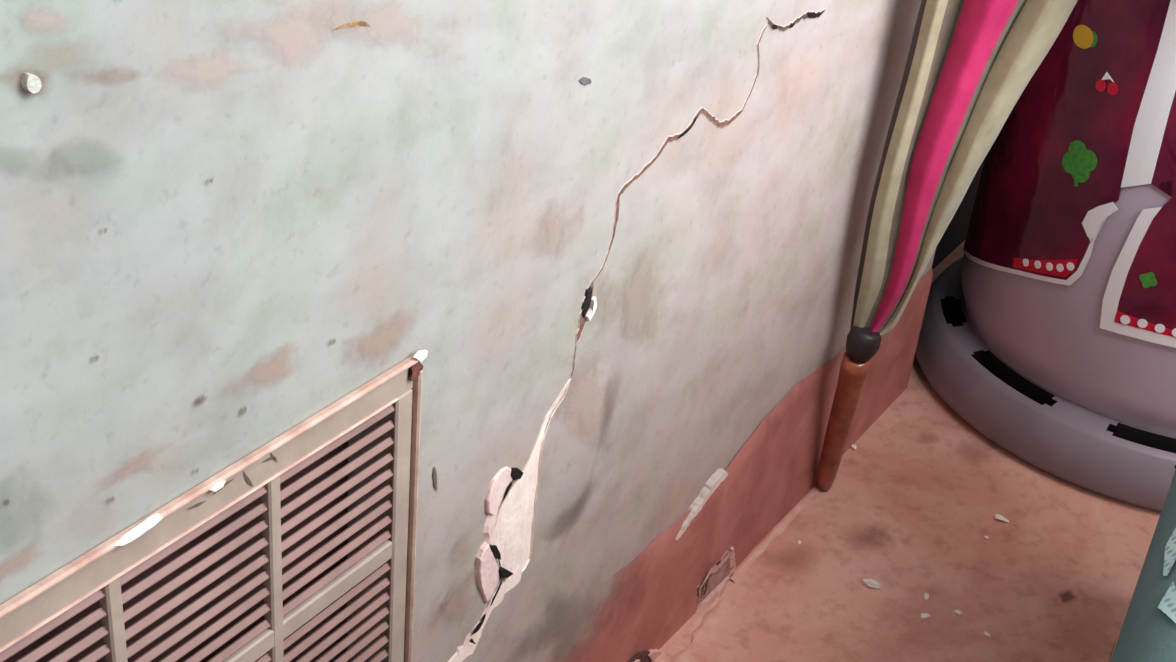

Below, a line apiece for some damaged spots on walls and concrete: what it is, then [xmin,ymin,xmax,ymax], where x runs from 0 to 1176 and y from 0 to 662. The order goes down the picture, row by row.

crack [570,9,826,379]
spalling [114,513,163,546]
spalling [475,378,572,606]
spalling [675,468,728,541]
crack [448,565,522,662]
spalling [695,546,736,613]
spalling [628,649,662,662]